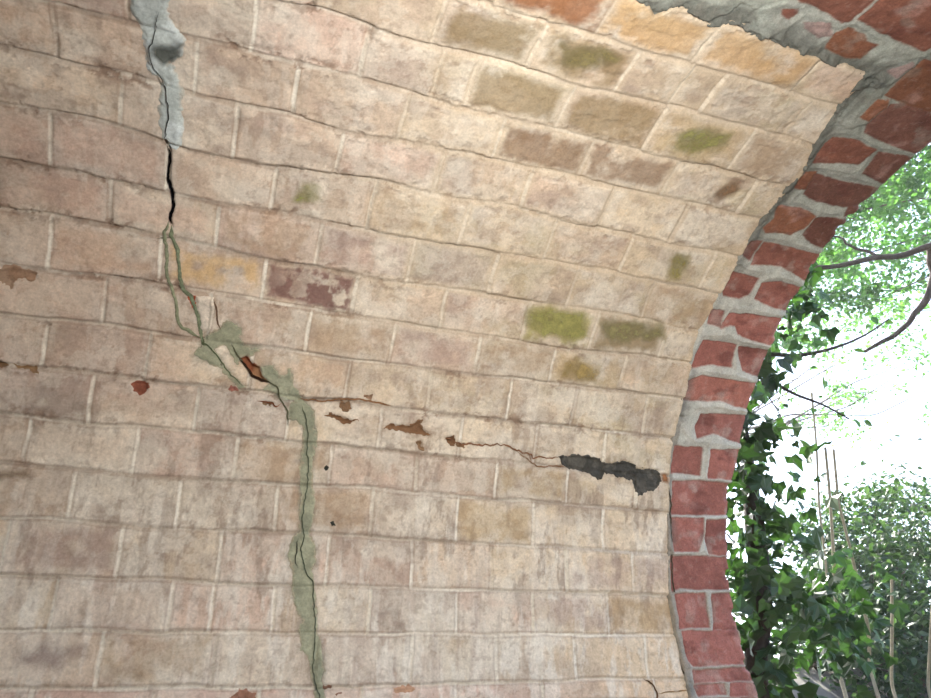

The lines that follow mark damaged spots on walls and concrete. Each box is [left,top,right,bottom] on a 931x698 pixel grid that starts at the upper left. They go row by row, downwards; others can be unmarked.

leakage [154,46,181,64]
crack [149,9,390,698]
peeling [324,400,359,424]
crack [446,438,564,468]
peeling [558,454,661,496]